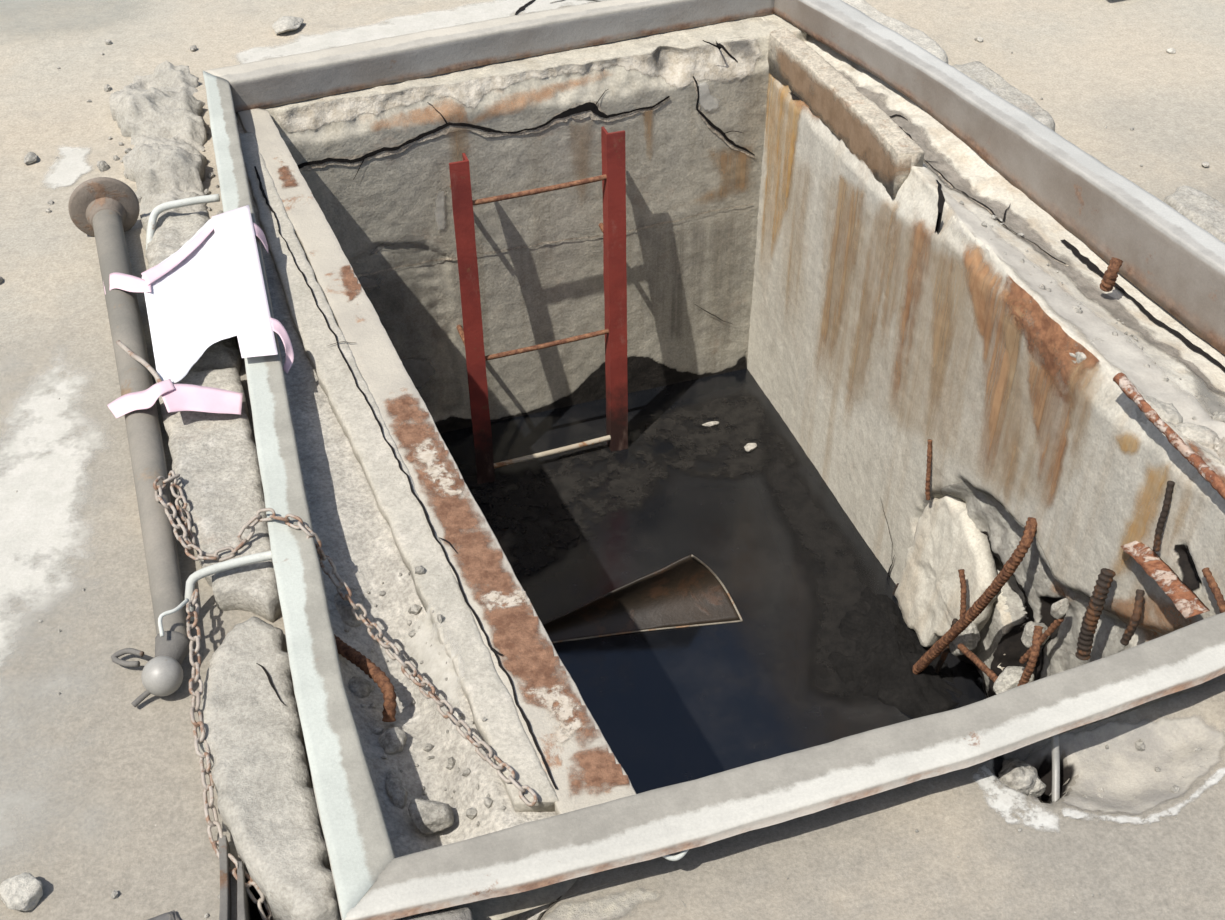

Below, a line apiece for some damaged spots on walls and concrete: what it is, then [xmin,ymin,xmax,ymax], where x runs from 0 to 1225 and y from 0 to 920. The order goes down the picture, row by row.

spalling [276,37,761,132]
crack [297,76,755,180]
crack [703,40,738,62]
corrosion [763,51,911,241]
corrosion [821,177,863,342]
corrosion [851,207,1099,501]
crack [889,114,1225,371]
crack [254,166,558,789]
corrosion [387,394,630,794]
spalling [894,439,1145,698]
spalling [1153,481,1225,613]
spalling [973,716,1225,830]